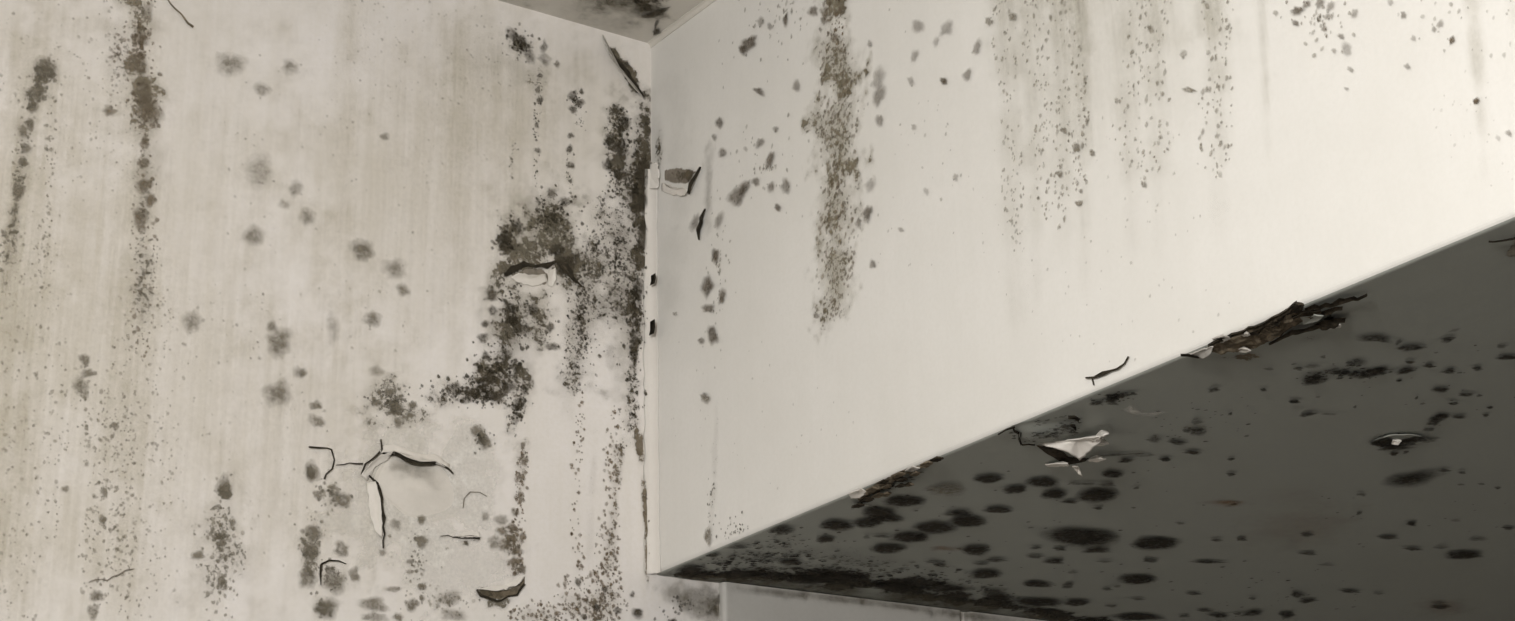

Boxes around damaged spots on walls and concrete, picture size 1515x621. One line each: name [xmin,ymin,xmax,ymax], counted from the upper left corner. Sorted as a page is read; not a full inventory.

damp [0,59,57,272]
damp [106,0,194,357]
flaking render [512,269,548,285]
damp [363,0,1249,621]
spalling [1181,294,1367,361]
damp [1292,335,1493,431]
spalling [848,456,944,508]
peeling [1036,430,1109,476]
damp [1392,469,1465,485]
peeling [440,531,480,545]
damp [89,568,134,618]
peeling [476,576,526,608]